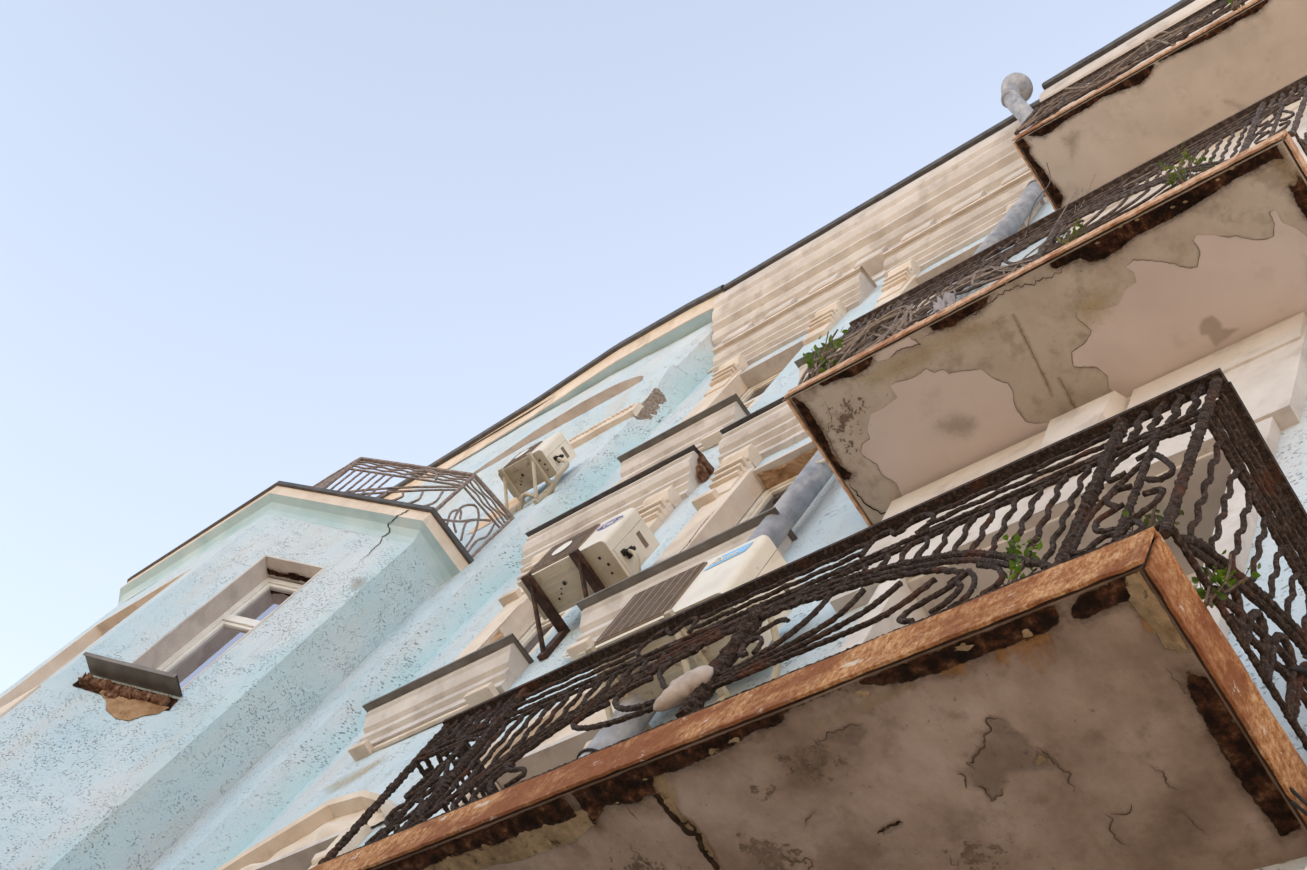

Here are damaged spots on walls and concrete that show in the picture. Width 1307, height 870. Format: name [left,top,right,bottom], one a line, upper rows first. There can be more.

spalling [1017,0,1269,209]
spalling [1050,145,1283,269]
peeling [1071,176,1307,398]
crack [363,510,408,559]
flaking render [72,672,179,720]
rust [652,777,676,803]
crack [625,793,722,870]
spalling [375,571,1190,870]
spalling [1187,674,1300,836]